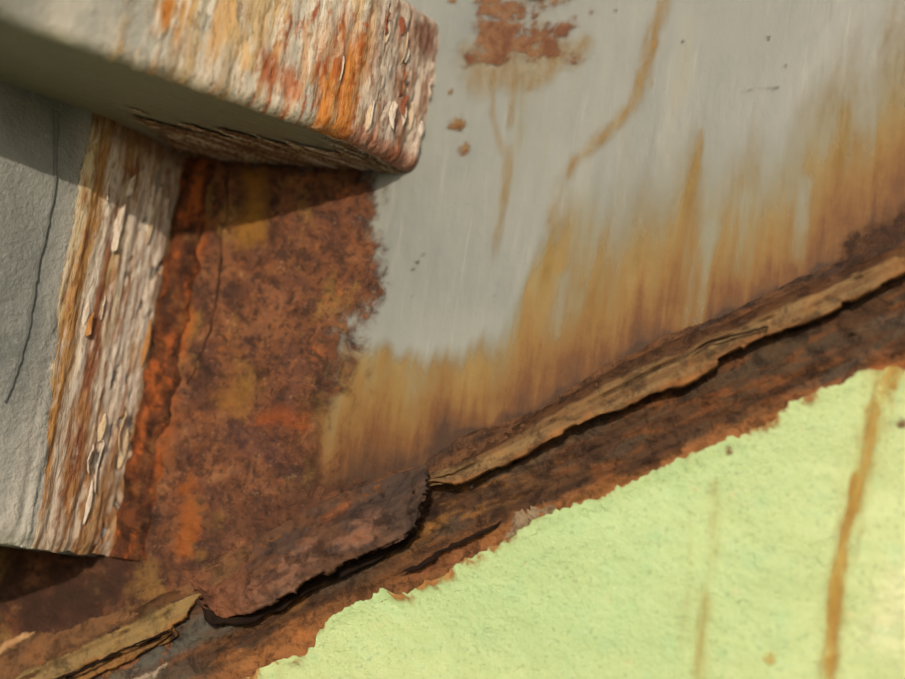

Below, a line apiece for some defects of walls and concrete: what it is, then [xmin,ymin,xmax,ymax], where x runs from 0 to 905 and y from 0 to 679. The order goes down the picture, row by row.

corrosion [464,0,575,71]
crack [4,110,60,402]
peeling [30,0,439,556]
corrosion [0,160,905,679]
corrosion [306,94,905,492]